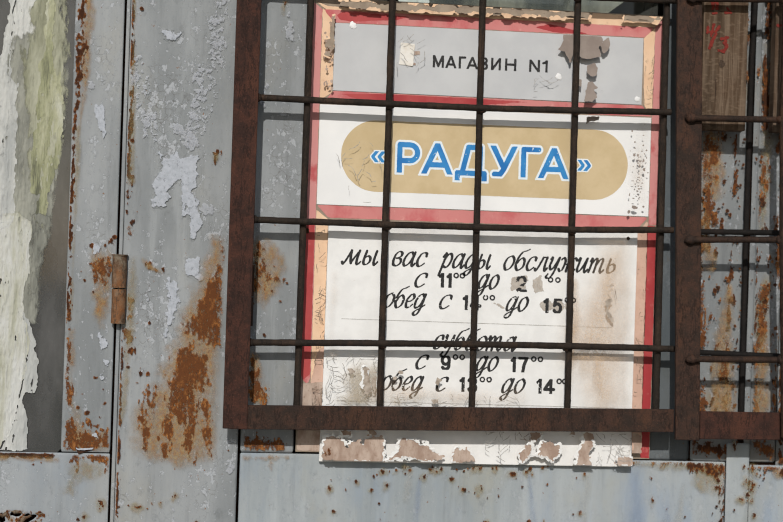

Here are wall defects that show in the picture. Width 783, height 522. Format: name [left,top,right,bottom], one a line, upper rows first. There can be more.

corrosion [0,452,55,465]
peeling [0,0,70,451]
corrosion [68,0,91,257]
corrosion [81,235,117,316]
corrosion [63,267,136,517]
corrosion [125,86,138,235]
peeling [129,55,158,141]
corrosion [136,241,224,466]
peeling [149,0,227,242]
corrosion [633,439,737,522]
corrosion [700,131,746,351]
corrosion [751,243,780,353]